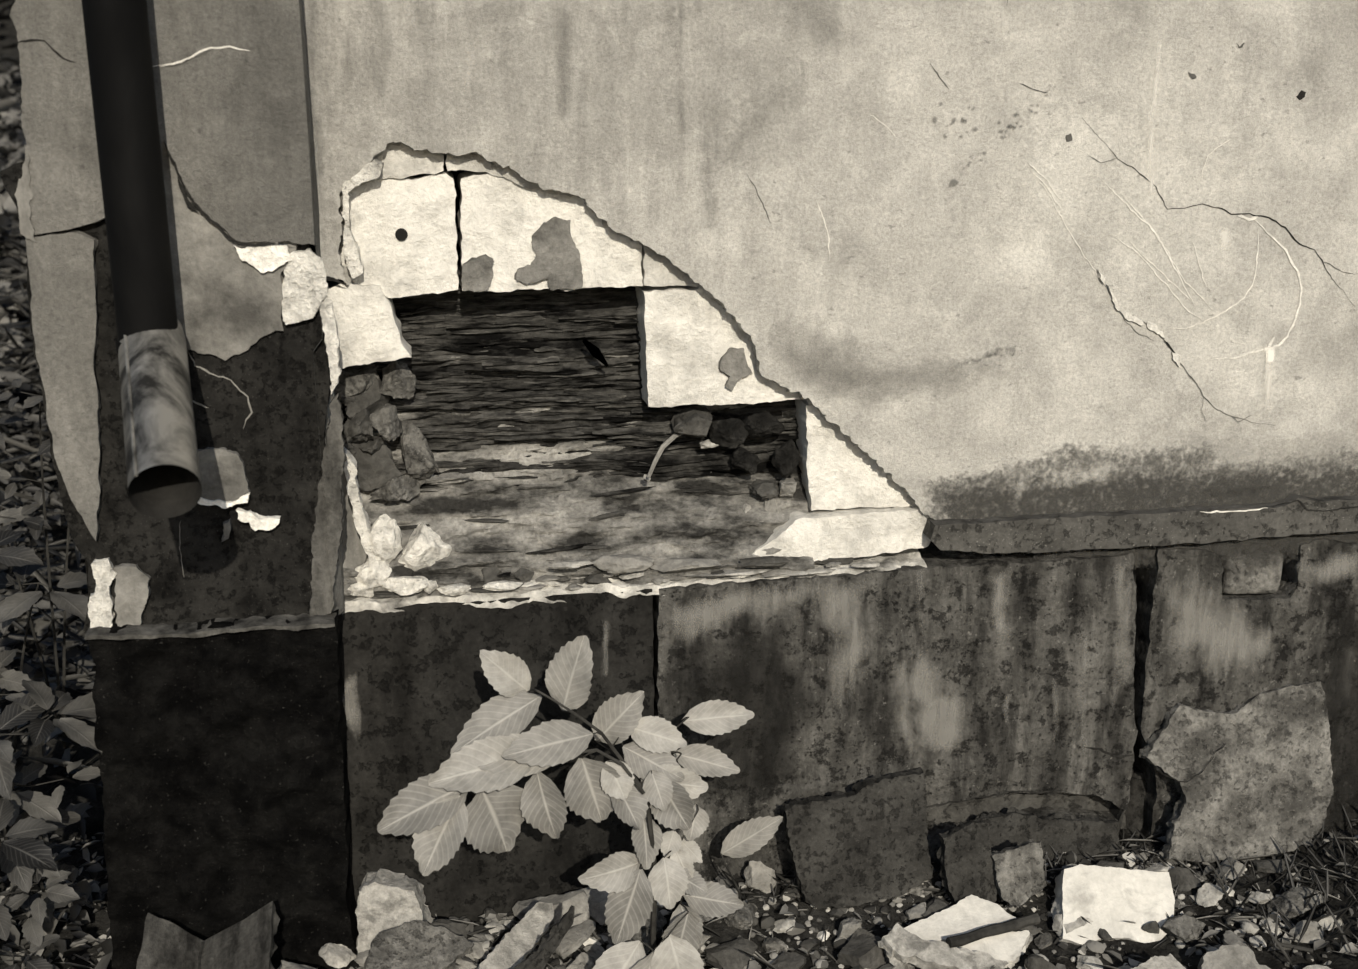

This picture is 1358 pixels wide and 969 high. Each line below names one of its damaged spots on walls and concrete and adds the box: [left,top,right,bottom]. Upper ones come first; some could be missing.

peeling [15,157,37,242]
crack [1082,117,1355,302]
crack [1033,172,1275,426]
spalling [233,143,931,616]
peeling [197,447,281,542]
leakage [932,445,1358,520]
peeling [88,557,151,628]
leakage [1045,531,1358,625]